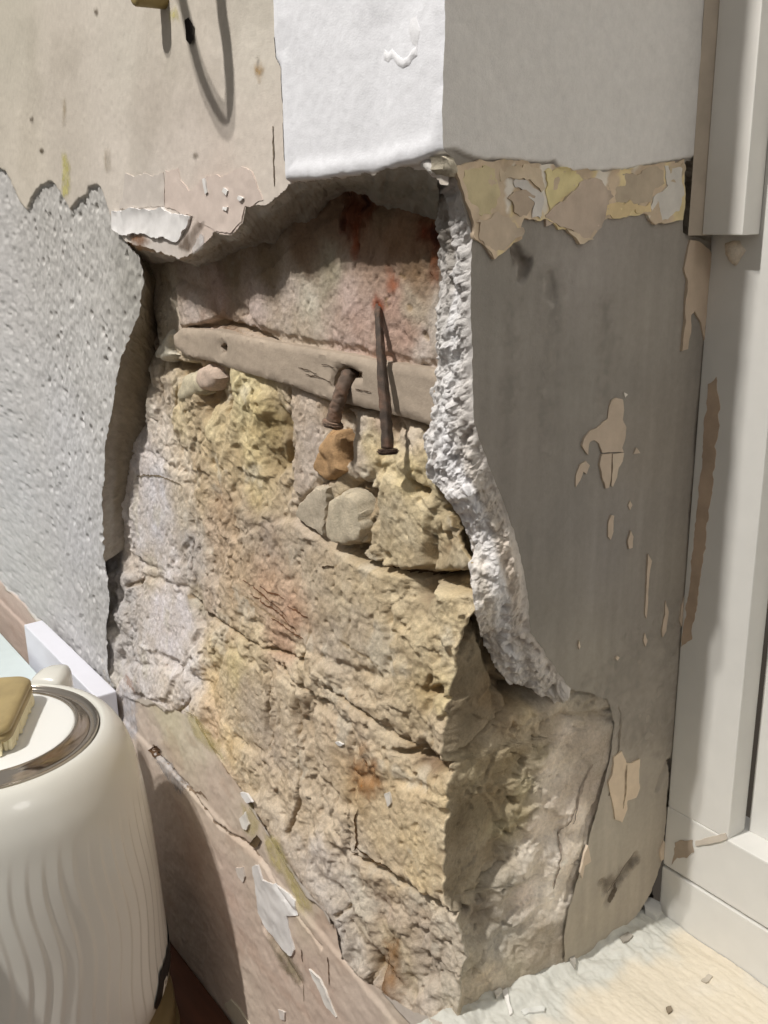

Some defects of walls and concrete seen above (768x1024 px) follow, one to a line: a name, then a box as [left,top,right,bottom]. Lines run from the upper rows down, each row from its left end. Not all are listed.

spalling [101,159,712,1017]